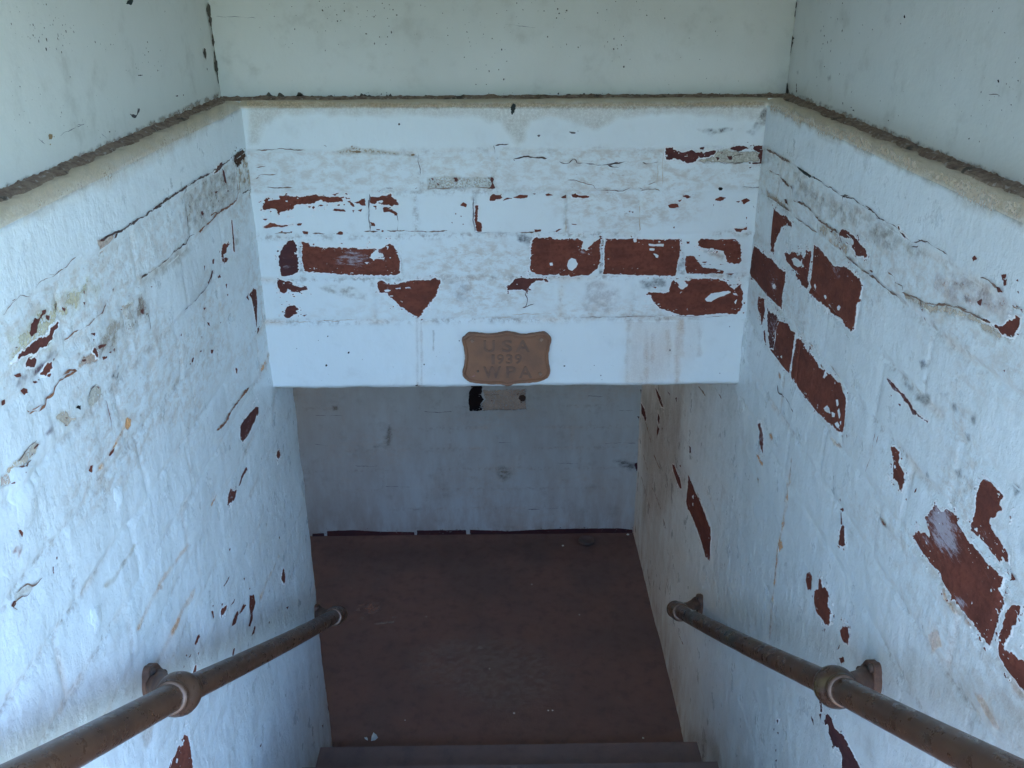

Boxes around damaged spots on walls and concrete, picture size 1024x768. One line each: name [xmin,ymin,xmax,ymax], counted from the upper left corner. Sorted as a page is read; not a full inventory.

crack [101,145,327,278]
peeling [213,147,444,320]
crack [364,188,447,233]
peeling [663,142,763,168]
crack [744,149,995,328]
peeling [10,287,86,395]
peeling [503,192,870,445]
peeling [672,443,712,561]
peeling [806,570,851,663]
peeling [909,468,1024,692]
peeling [168,720,195,768]
peeling [811,701,861,768]